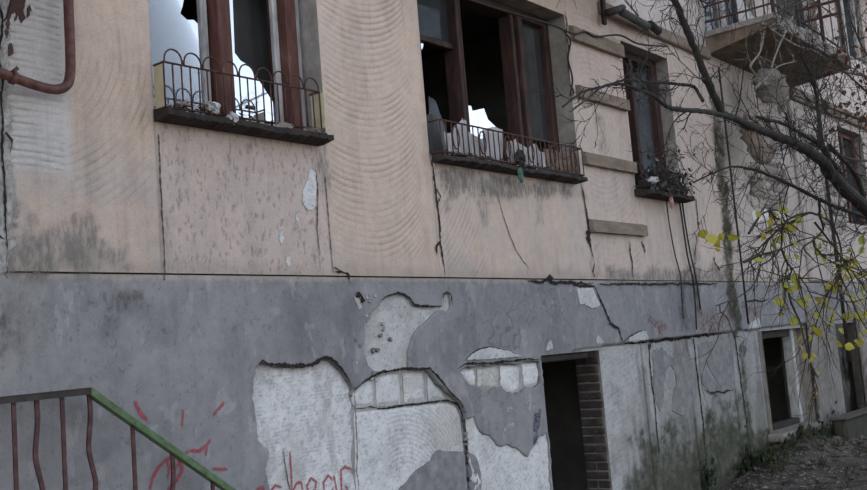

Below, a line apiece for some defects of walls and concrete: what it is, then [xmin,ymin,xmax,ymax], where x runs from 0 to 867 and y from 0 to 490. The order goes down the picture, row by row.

peeling [4,0,34,56]
crack [0,0,13,273]
peeling [295,169,320,261]
crack [429,151,445,281]
peeling [576,287,600,308]
crack [496,185,750,463]
flaking render [250,291,553,490]